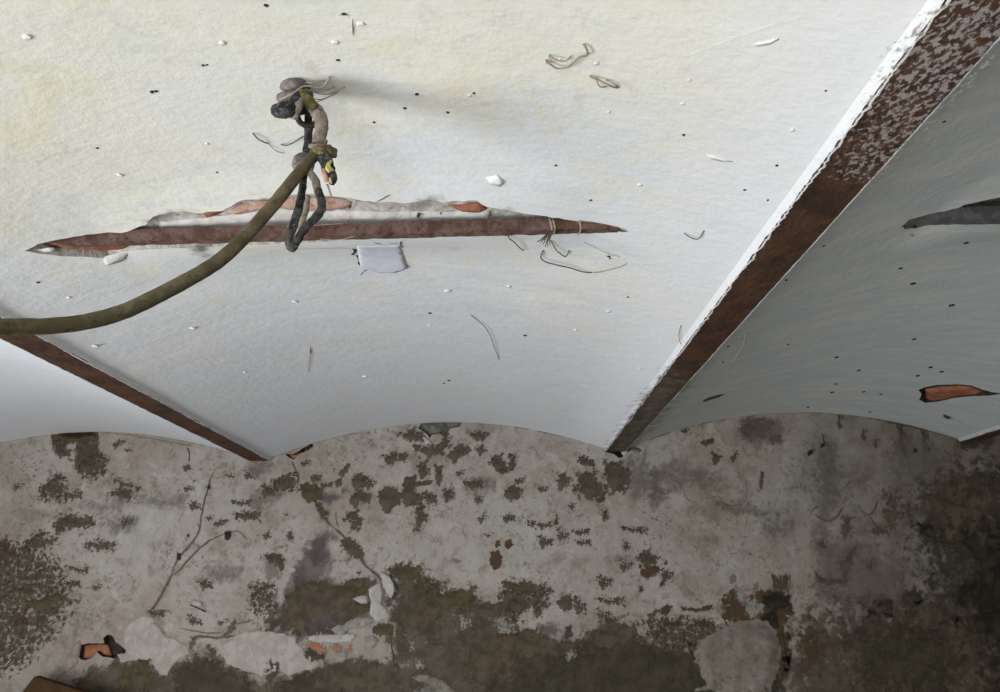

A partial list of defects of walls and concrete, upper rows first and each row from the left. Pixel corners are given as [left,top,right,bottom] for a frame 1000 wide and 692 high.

spalling [26,198,270,265]
spalling [264,194,573,226]
spalling [948,197,1000,211]
spalling [919,384,1000,403]
damp [698,438,739,466]
damp [738,416,782,445]
damp [0,432,142,680]
crack [149,469,254,647]
damp [72,426,715,692]
damp [721,437,1000,692]
flaking render [63,615,190,676]
flaking render [219,572,395,678]